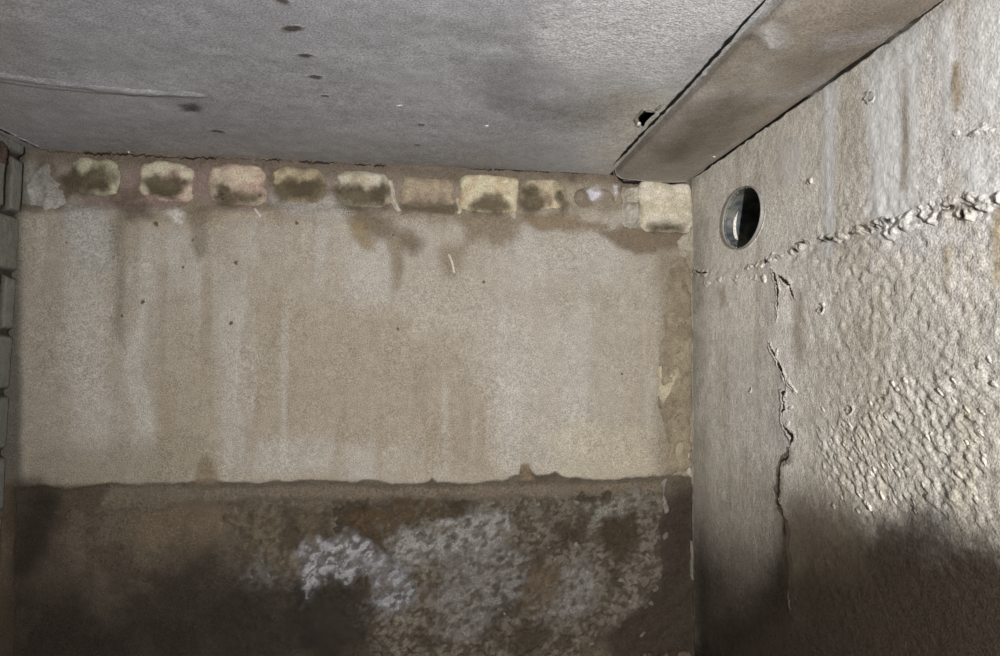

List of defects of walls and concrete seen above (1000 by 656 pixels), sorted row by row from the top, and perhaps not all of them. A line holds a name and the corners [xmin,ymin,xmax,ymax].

damp [68,207,120,263]
damp [166,209,184,225]
damp [530,216,688,253]
crack [767,267,797,618]
damp [13,454,1000,656]